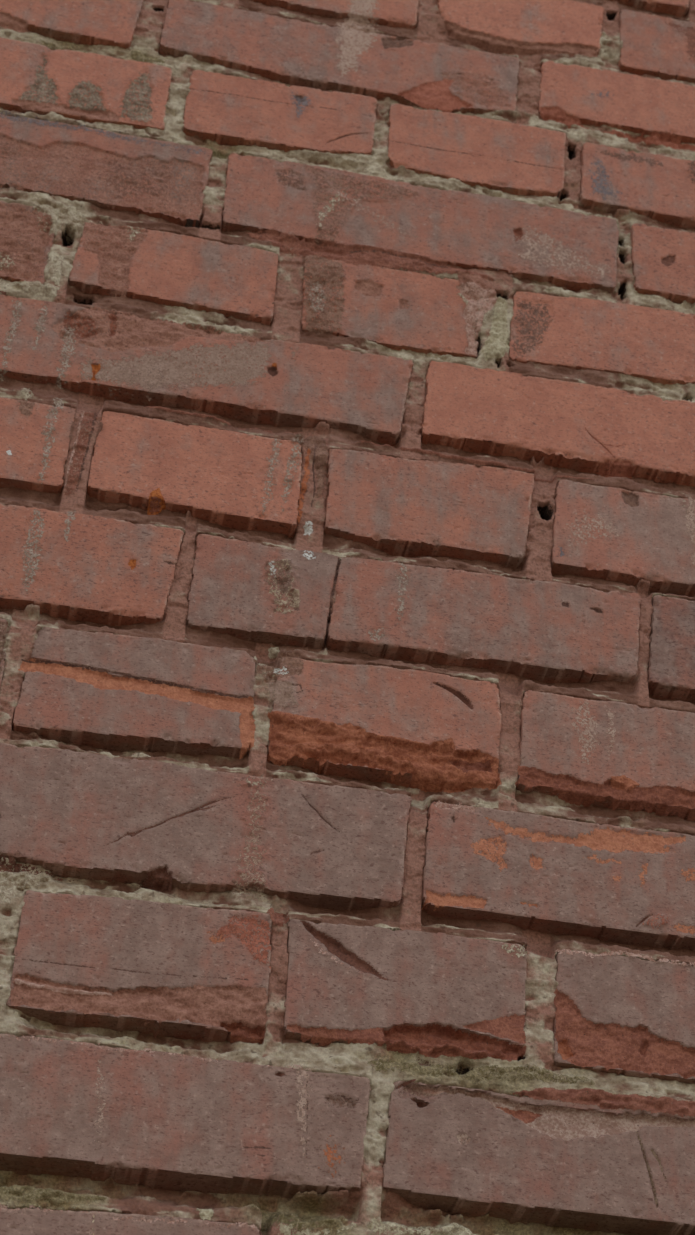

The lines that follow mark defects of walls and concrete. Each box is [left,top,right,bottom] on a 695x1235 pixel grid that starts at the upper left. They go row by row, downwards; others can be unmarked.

spalling [18,658,695,887]
crack [104,796,235,846]
peeling [10,973,268,1045]
spalling [287,1013,526,1062]
spalling [554,988,695,1079]